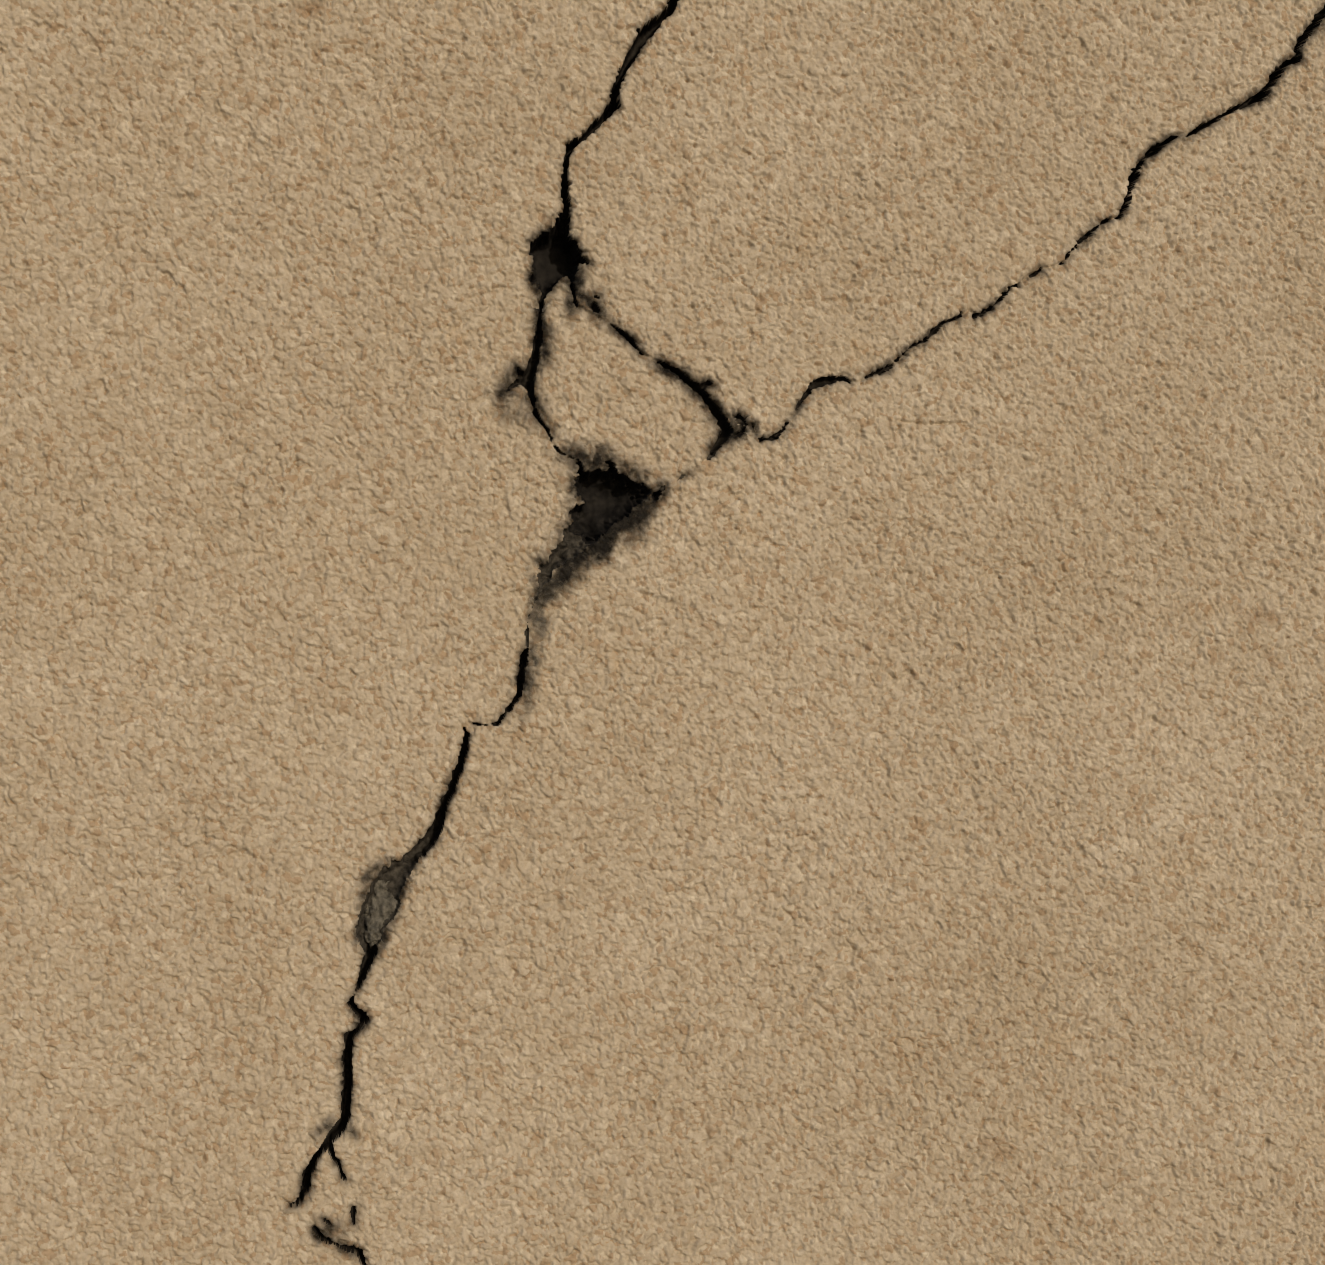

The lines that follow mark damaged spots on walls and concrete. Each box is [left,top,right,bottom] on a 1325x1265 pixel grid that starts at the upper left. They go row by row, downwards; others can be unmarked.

crack [498,0,1325,502]
crack [417,584,544,855]
crack [288,947,378,1265]